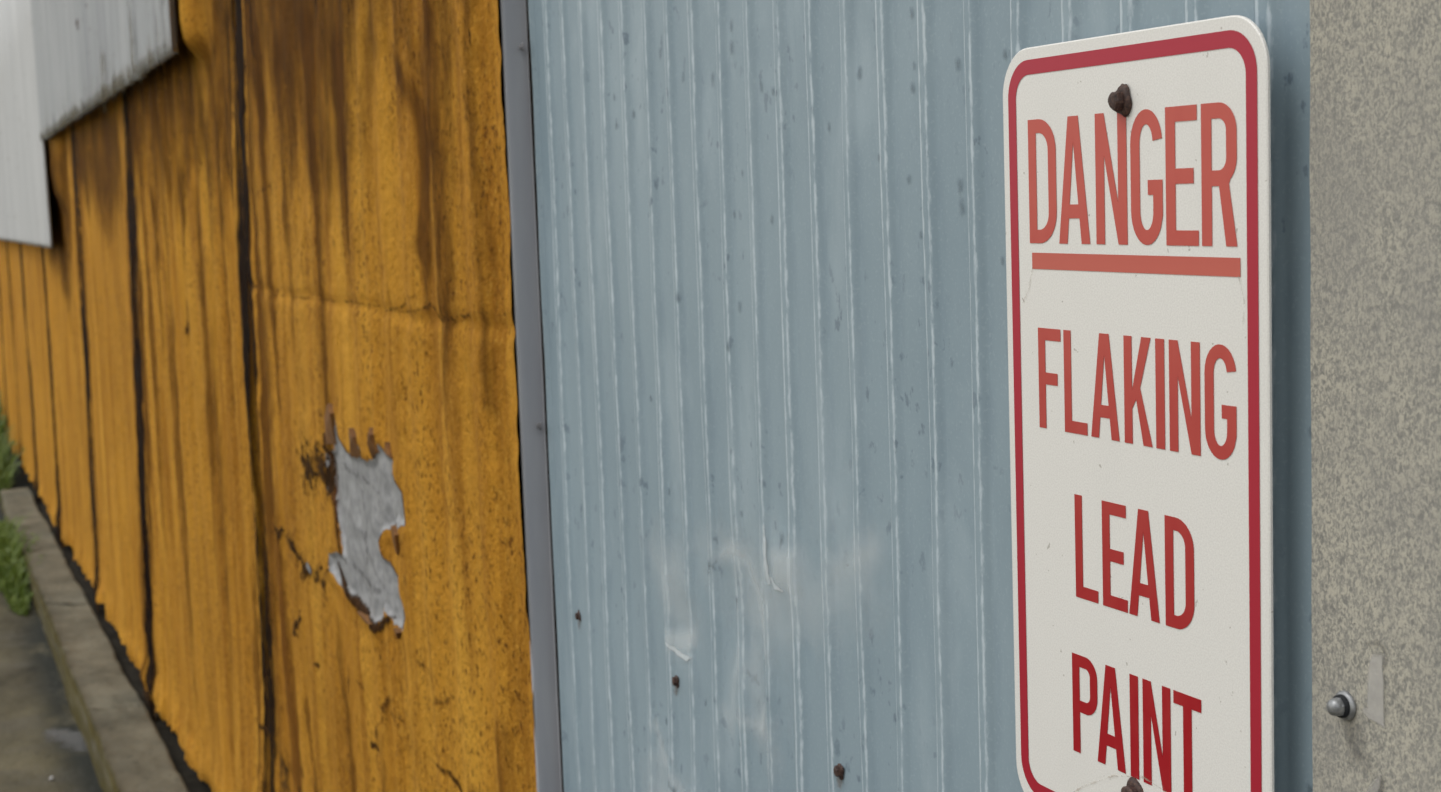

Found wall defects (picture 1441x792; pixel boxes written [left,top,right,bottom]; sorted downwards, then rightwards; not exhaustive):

water stain [47,0,373,411]
water stain [395,0,450,336]
peeling [322,403,405,639]